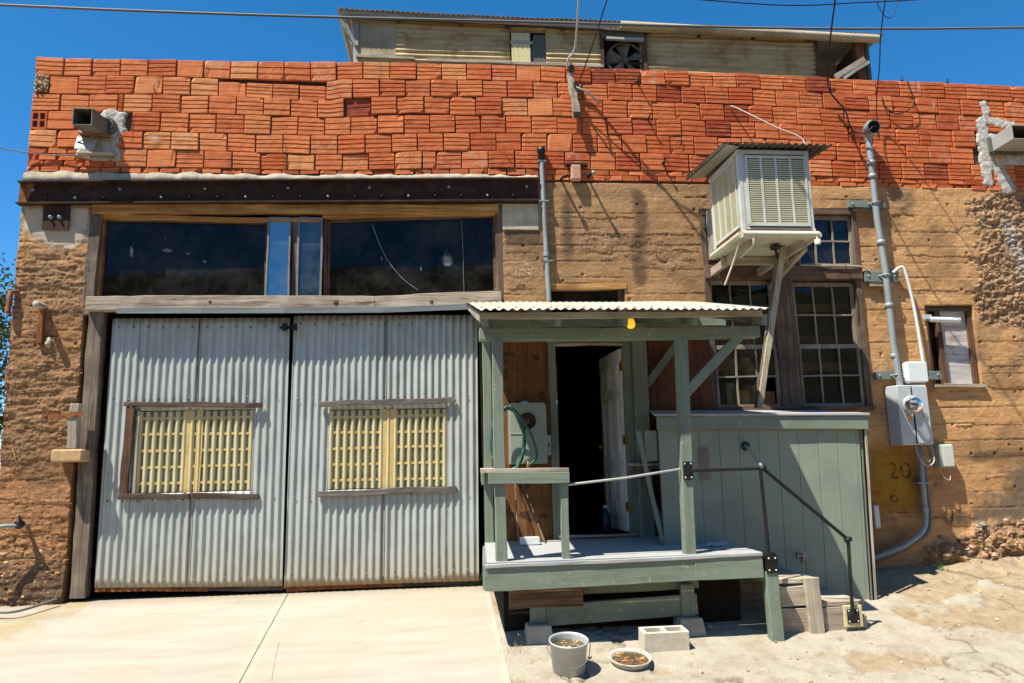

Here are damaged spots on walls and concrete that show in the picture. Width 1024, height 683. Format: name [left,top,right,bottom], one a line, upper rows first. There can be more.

spalling [971,192,1024,324]
peeling [904,518,1024,566]